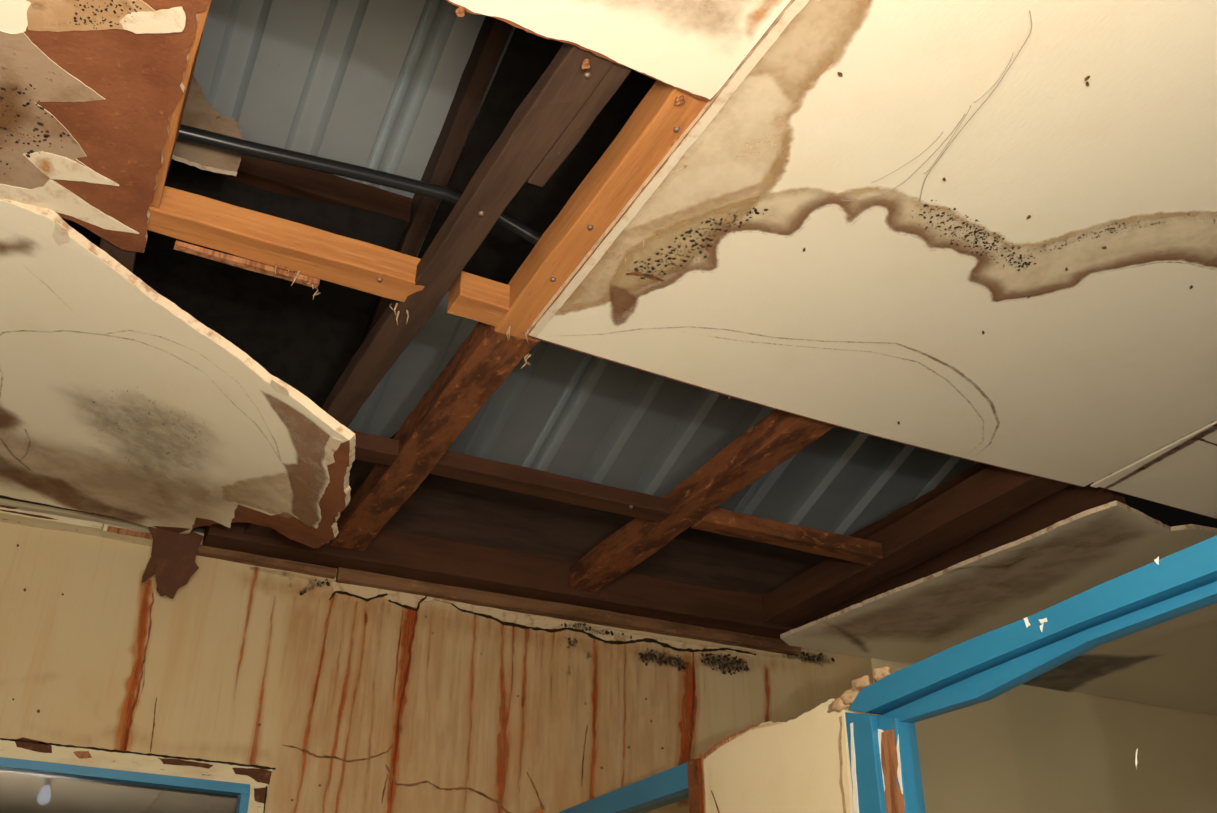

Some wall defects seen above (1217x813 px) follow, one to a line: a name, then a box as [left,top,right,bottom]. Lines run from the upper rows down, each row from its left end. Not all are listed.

peeling [0,0,186,246]
leakage [600,114,1217,324]
leakage [0,446,142,522]
leakage [224,395,330,528]
peeling [14,737,52,753]
rust [118,580,154,751]
crack [0,697,512,813]
rust [388,607,417,813]
rust [497,624,528,813]
crack [527,773,545,810]
crack [329,591,756,655]
peeling [878,729,905,813]